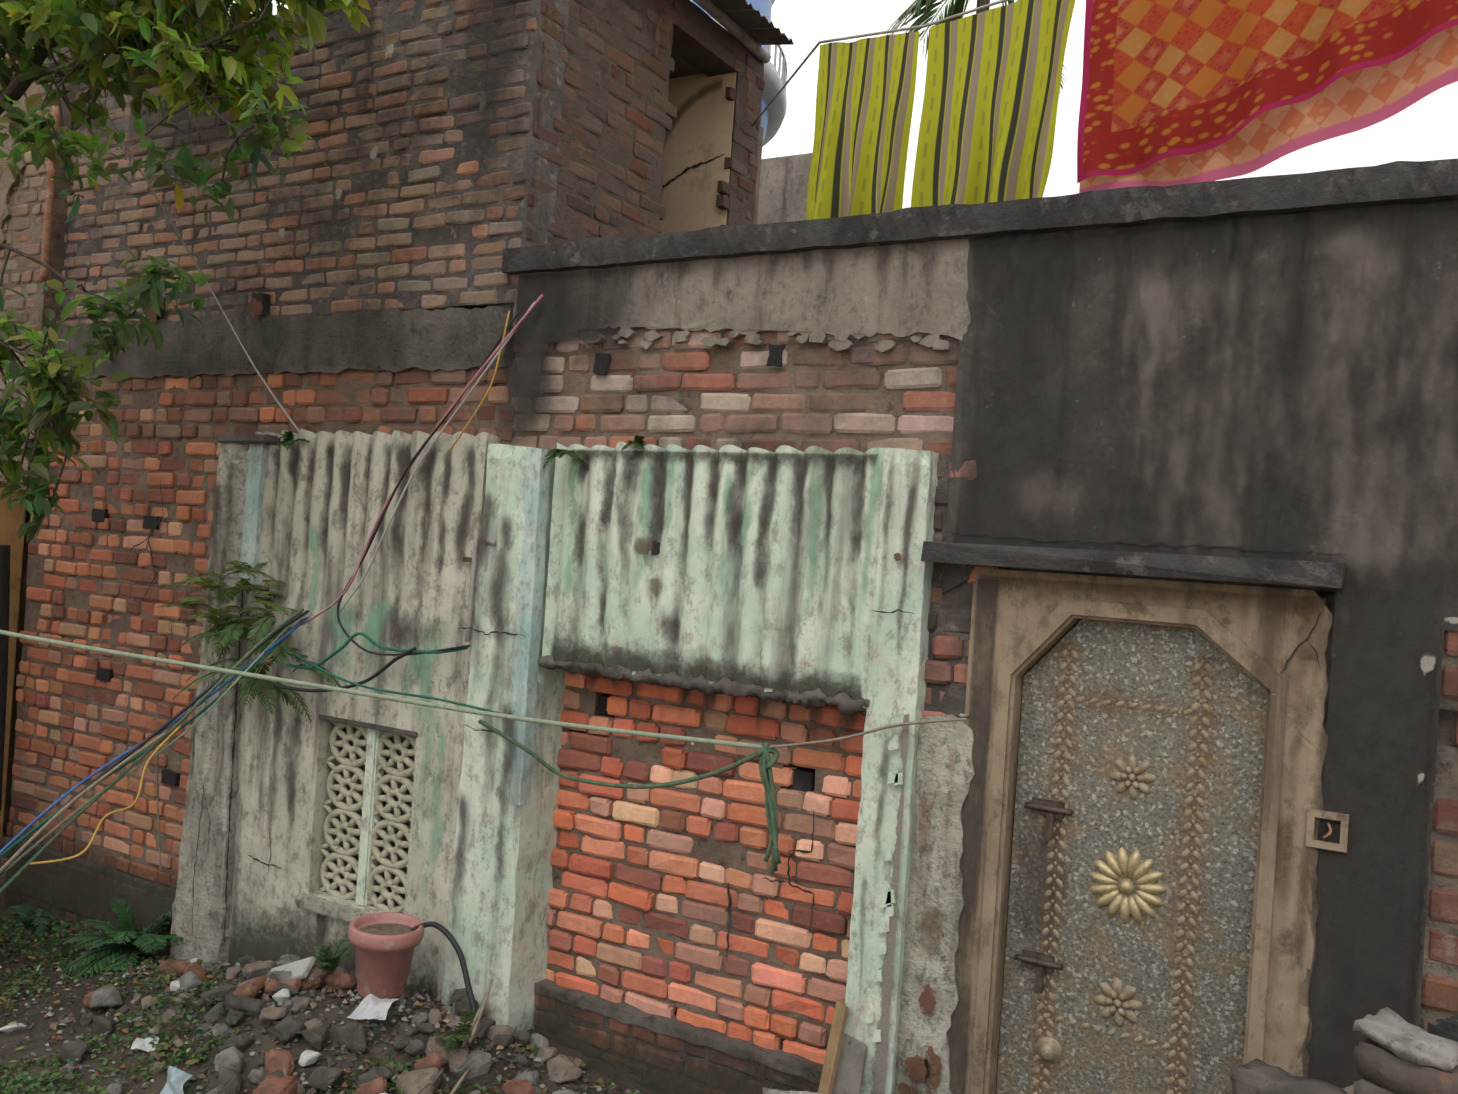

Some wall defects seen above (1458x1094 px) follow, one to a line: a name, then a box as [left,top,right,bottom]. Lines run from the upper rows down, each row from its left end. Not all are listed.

crack [662,154,725,189]
flaking render [583,328,855,376]
flaking render [874,334,951,353]
leakage [955,208,1458,561]
leakage [274,444,509,646]
leakage [576,451,834,586]
leakage [851,457,916,631]
leakage [551,617,862,736]
crack [1281,611,1323,673]
flaking render [1421,655,1435,673]
leakage [1259,520,1457,1089]
peeling [861,714,942,1094]